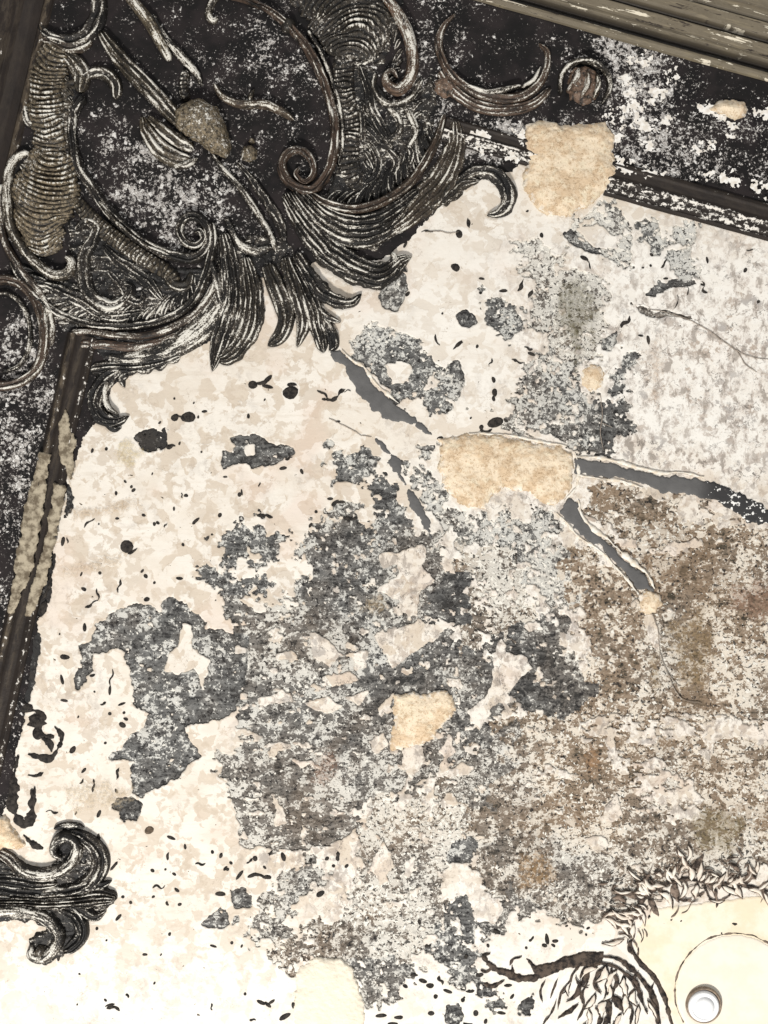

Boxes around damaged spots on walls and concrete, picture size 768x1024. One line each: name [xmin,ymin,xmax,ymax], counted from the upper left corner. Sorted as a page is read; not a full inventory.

crack [330,350,432,539]
peeling [349,198,709,462]
crack [472,394,768,704]
peeling [698,498,715,515]
peeling [60,434,619,1024]
peeling [654,777,692,817]